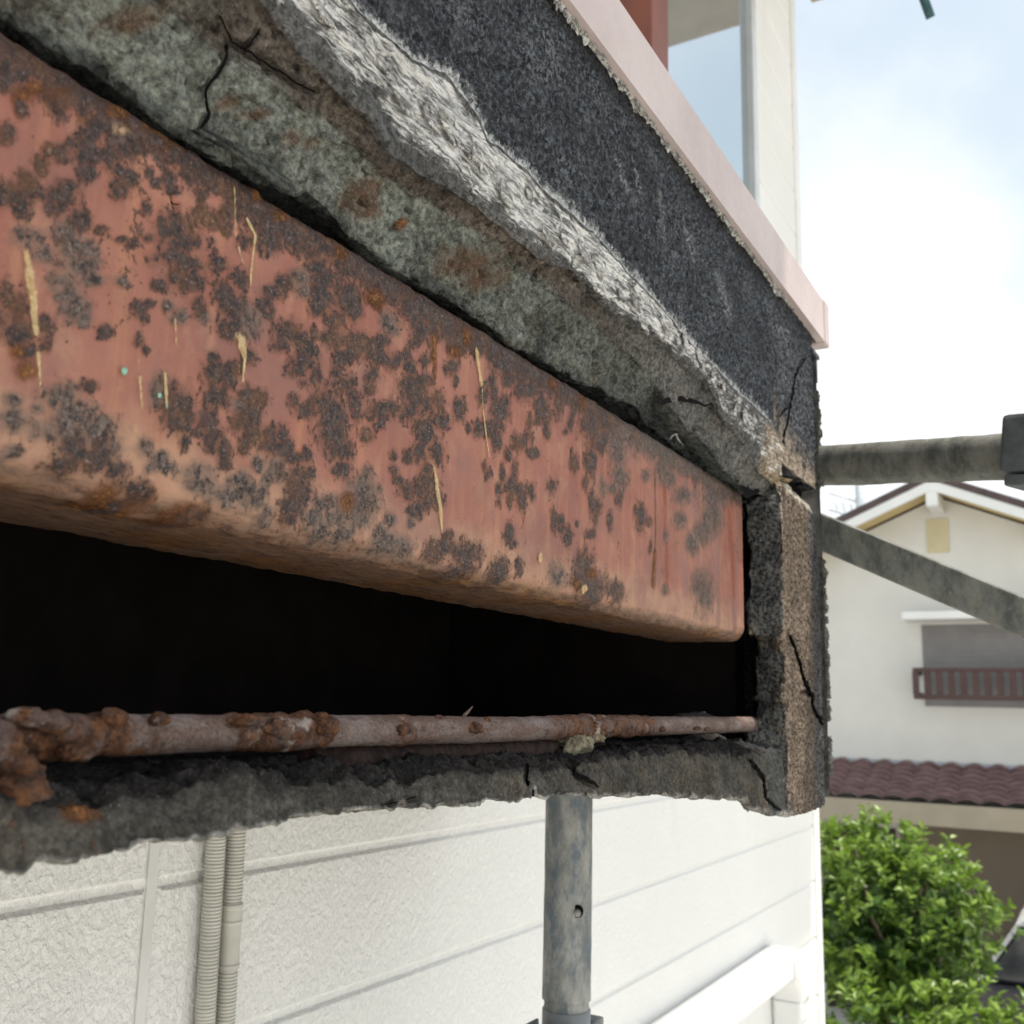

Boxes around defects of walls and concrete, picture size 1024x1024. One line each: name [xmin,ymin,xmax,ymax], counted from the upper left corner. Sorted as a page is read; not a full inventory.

crack [200,16,315,129]
rust [0,33,740,618]
crack [780,358,806,447]
peeling [812,365,823,452]
peeling [801,472,834,797]
crack [789,635,824,725]
crack [525,763,534,797]
crack [571,763,600,788]